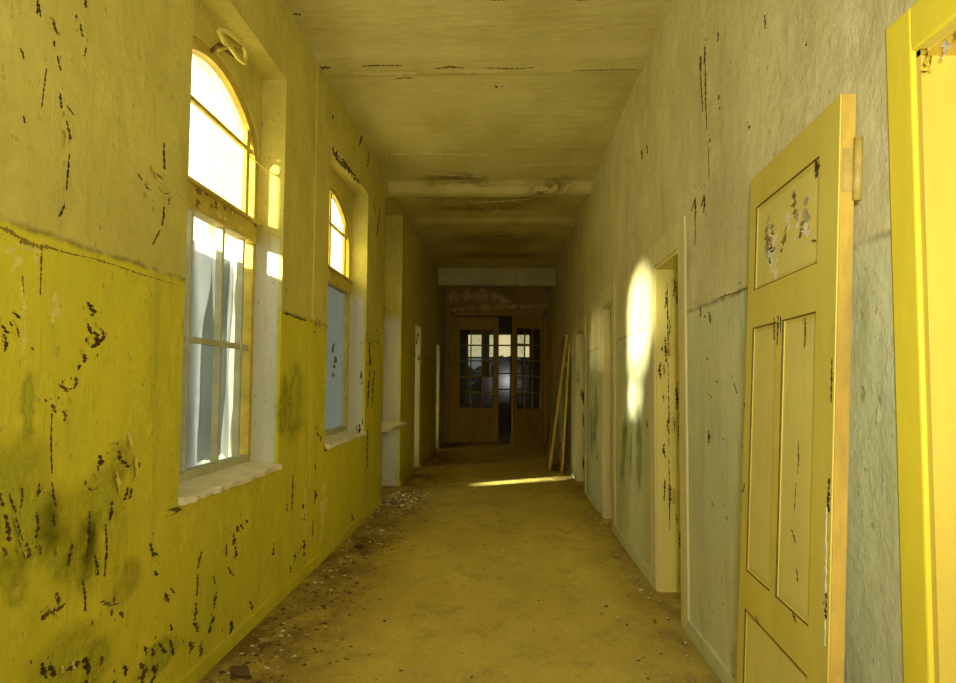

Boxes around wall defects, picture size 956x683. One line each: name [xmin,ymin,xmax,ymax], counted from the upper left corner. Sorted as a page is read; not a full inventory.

spalling [699,25,719,165]
peeling [922,31,956,77]
peeling [134,143,170,245]
peeling [0,302,107,559]
peeling [658,280,679,459]
damp [0,447,127,603]
peeling [55,433,141,577]
peeling [30,551,234,683]
peeling [225,515,248,581]
peeling [663,471,680,547]